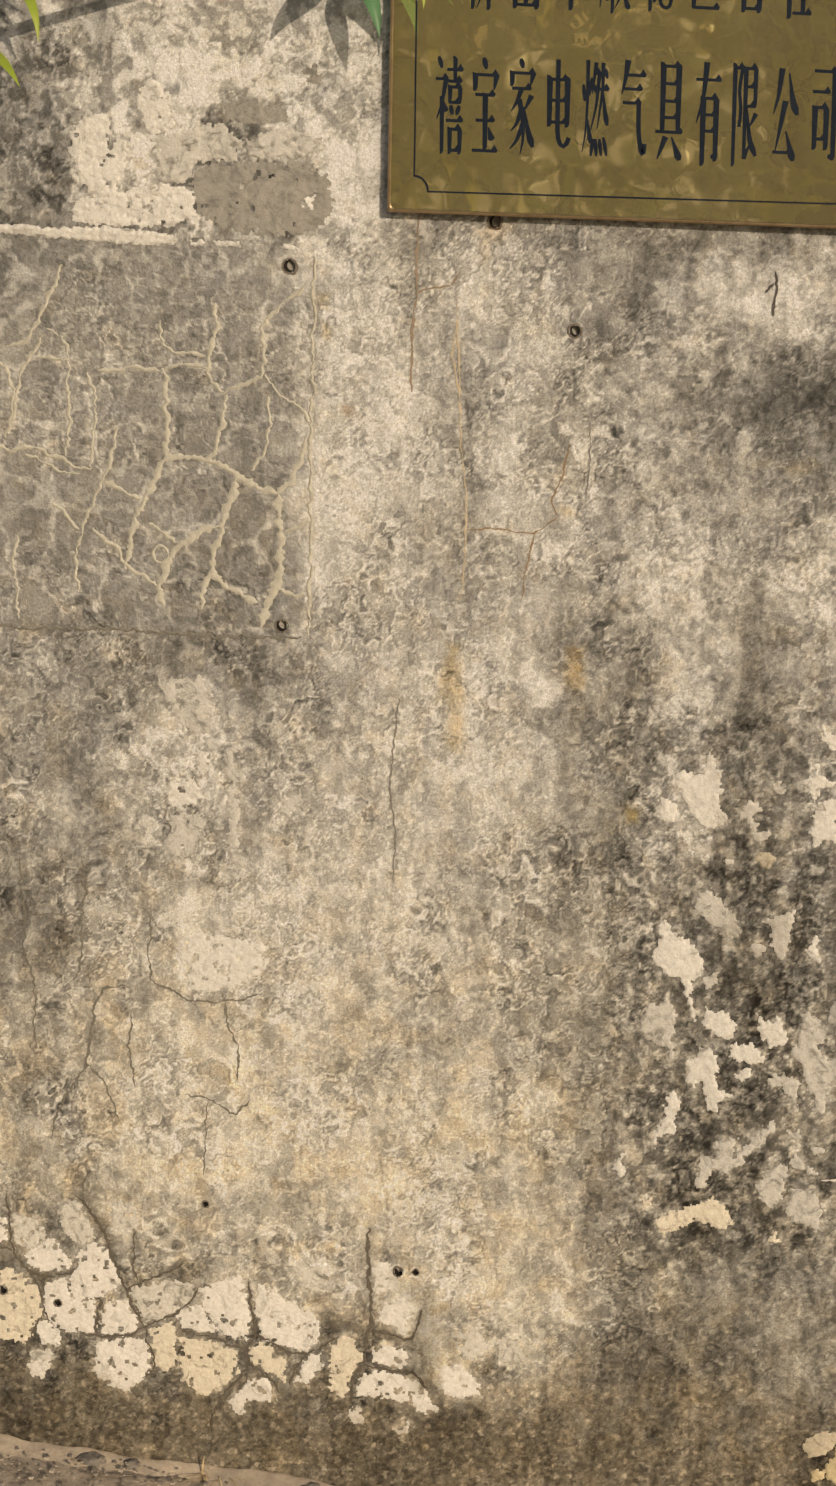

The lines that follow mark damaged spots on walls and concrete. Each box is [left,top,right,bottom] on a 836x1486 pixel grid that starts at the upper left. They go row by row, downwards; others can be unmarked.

peeling [659,749,777,869]
peeling [772,780,786,794]
peeling [804,724,836,847]
peeling [695,890,821,964]
crack [0,1193,428,1433]